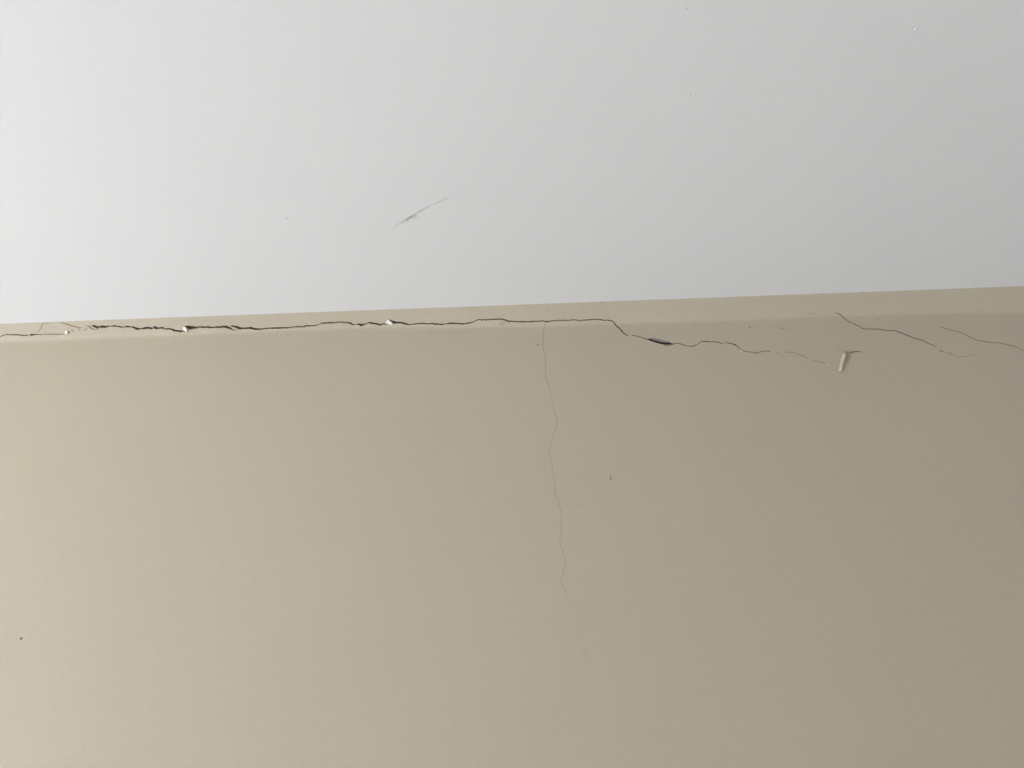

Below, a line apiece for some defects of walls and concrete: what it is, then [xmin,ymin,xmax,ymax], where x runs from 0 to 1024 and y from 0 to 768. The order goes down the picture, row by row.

crack [674,341,829,366]
crack [807,312,1023,357]
crack [0,318,648,667]